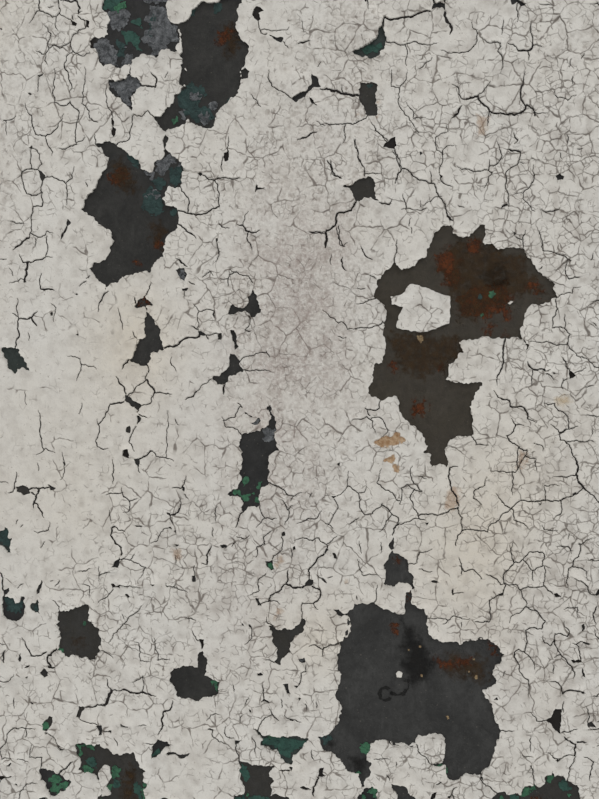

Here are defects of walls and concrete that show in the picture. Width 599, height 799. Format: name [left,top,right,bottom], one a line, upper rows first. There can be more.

crack [82,360,242,600]
peeling [82,0,249,287]
crack [164,137,259,370]
peeling [228,405,279,512]
crack [311,202,376,304]
crack [232,230,599,780]
crack [298,0,559,263]
peeling [368,225,558,467]
peeling [57,604,101,660]
crack [80,607,173,746]
peeling [169,639,219,701]
peeling [318,537,504,799]